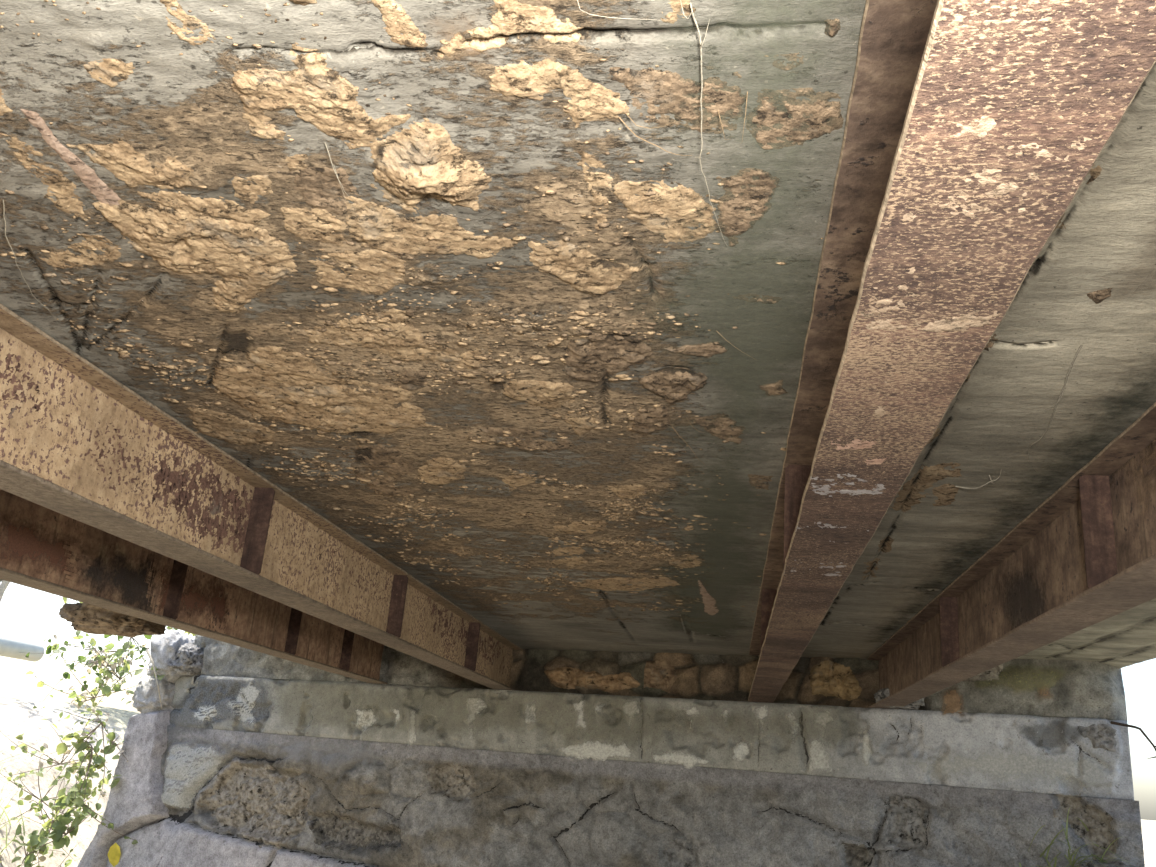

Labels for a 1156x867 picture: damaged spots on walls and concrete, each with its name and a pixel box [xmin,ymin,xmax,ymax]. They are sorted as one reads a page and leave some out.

crack [340,41,441,53]
spalling [371,0,584,58]
crack [468,22,803,42]
spalling [231,42,411,165]
spalling [489,57,844,151]
spalling [0,133,643,314]
crack [1016,206,1075,295]
rust [0,334,69,434]
rust [80,418,253,561]
rust [0,516,172,612]
rust [1005,572,1046,630]
crack [135,757,378,867]